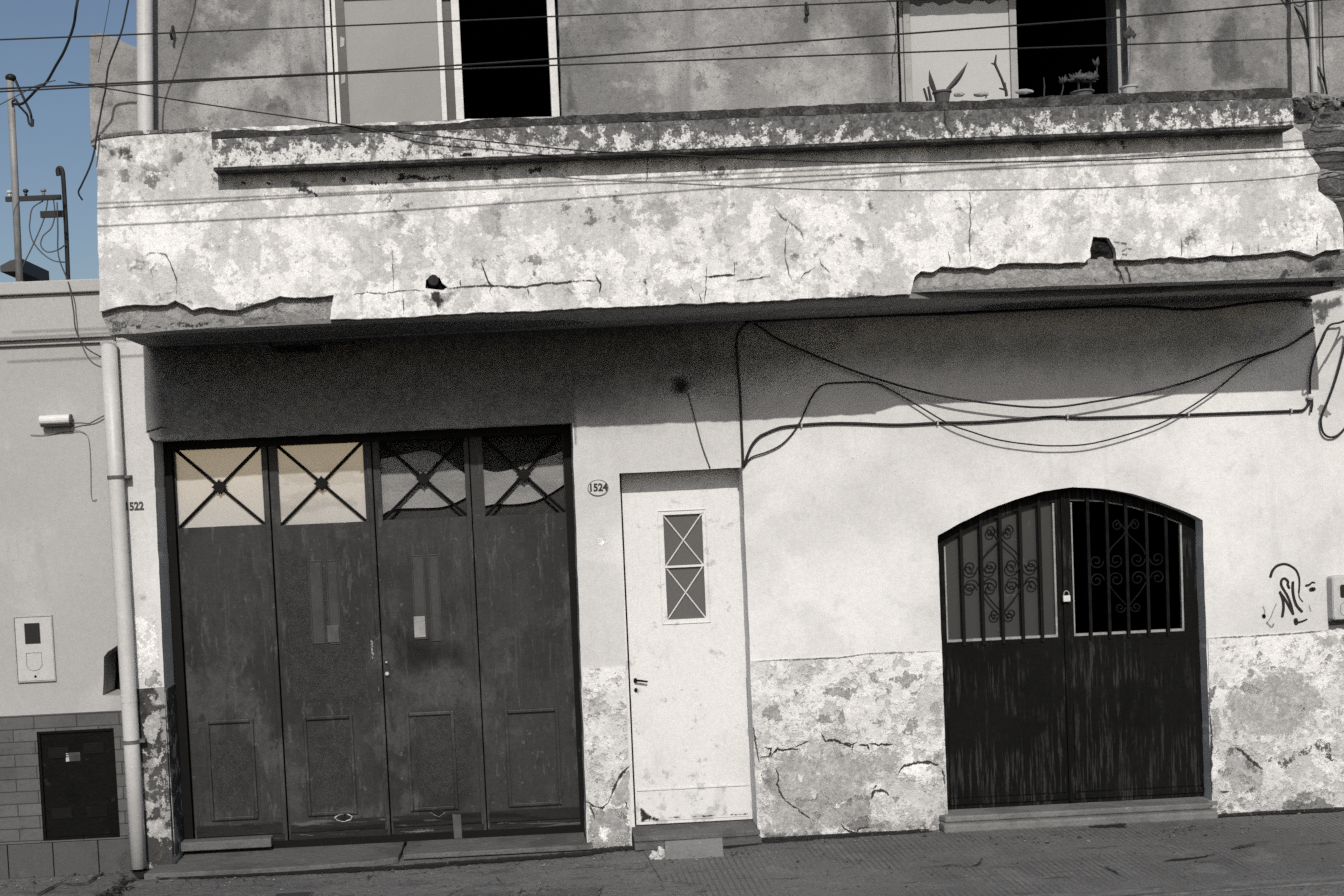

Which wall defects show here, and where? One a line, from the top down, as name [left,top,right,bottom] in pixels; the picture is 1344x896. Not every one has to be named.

flaking render [1292,95,1344,234]
peeling [607,197,679,244]
flaking render [282,299,327,313]
flaking render [915,250,1344,289]
peeling [133,613,161,688]
peeling [869,668,923,702]
peeling [1208,620,1344,792]
peeling [141,710,168,838]
crack [586,765,630,819]
peeling [589,806,630,848]
peeling [762,687,900,837]
crack [753,727,945,833]